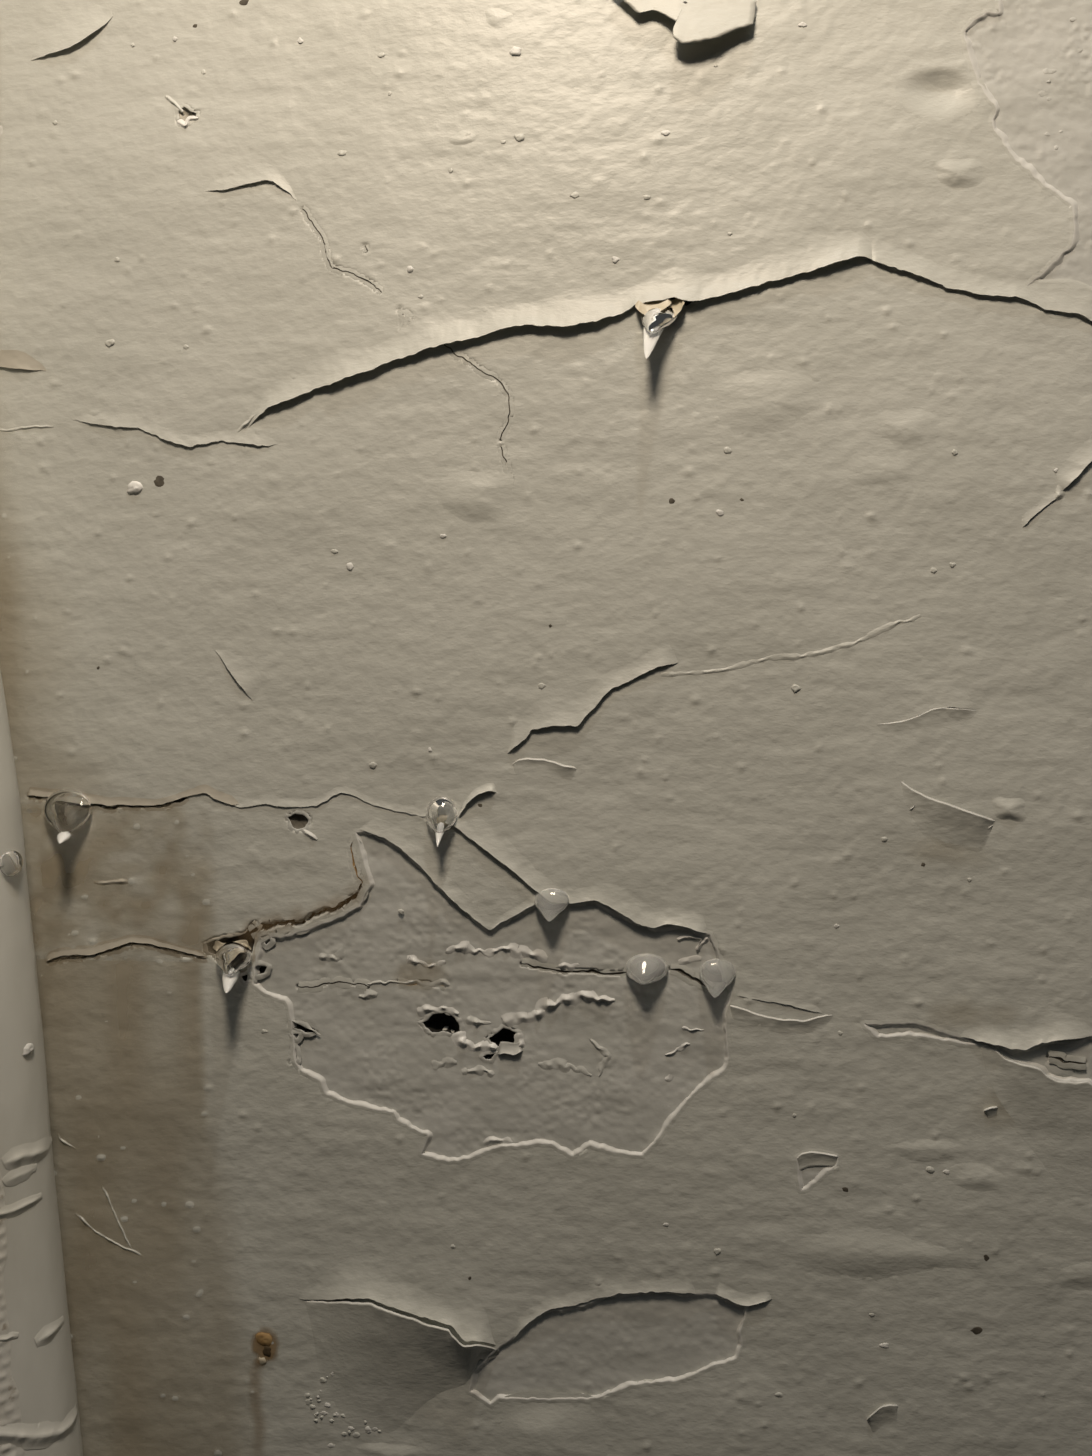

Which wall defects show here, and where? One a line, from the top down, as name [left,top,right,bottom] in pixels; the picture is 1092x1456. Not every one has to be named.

peeling [72,0,1092,447]
peeling [1021,435,1092,528]
peeling [507,643,678,780]
peeling [901,782,995,852]
peeling [202,803,833,1165]
peeling [860,1012,1092,1195]
rust [253,1332,277,1365]
peeling [299,1260,772,1433]